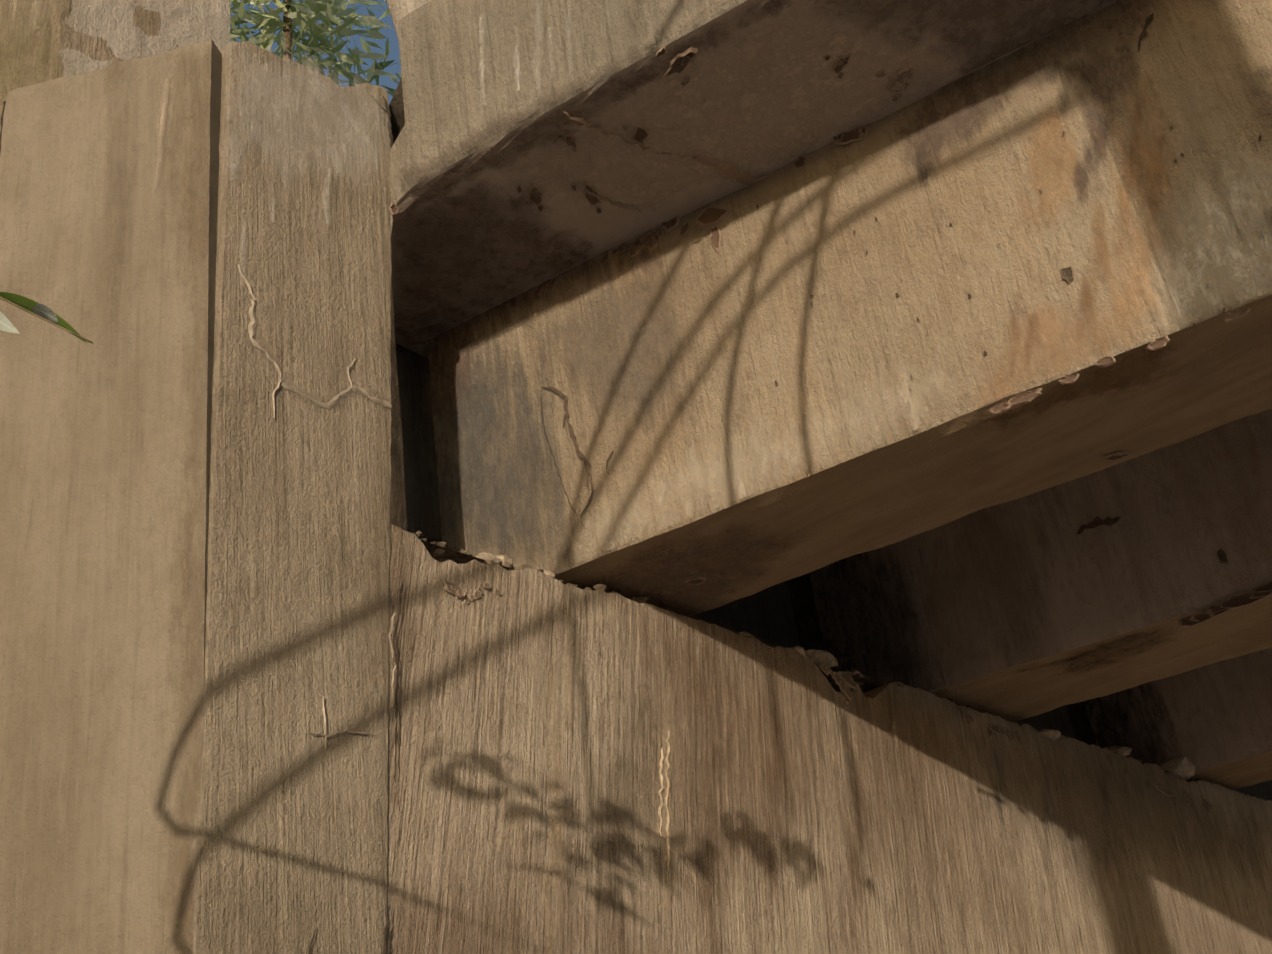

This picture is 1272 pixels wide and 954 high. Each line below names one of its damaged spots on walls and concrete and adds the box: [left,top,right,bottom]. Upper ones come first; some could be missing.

water stain [824,0,1154,199]
crack [238,264,392,418]
water stain [395,0,785,556]
water stain [1147,166,1272,313]
crack [540,386,614,528]